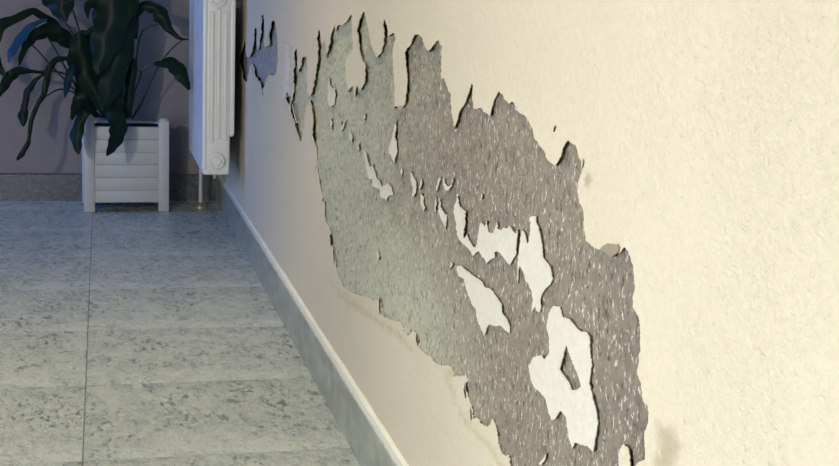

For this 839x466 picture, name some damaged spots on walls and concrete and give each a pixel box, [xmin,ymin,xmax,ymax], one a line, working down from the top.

peeling [240,16,278,96]
peeling [286,13,649,466]